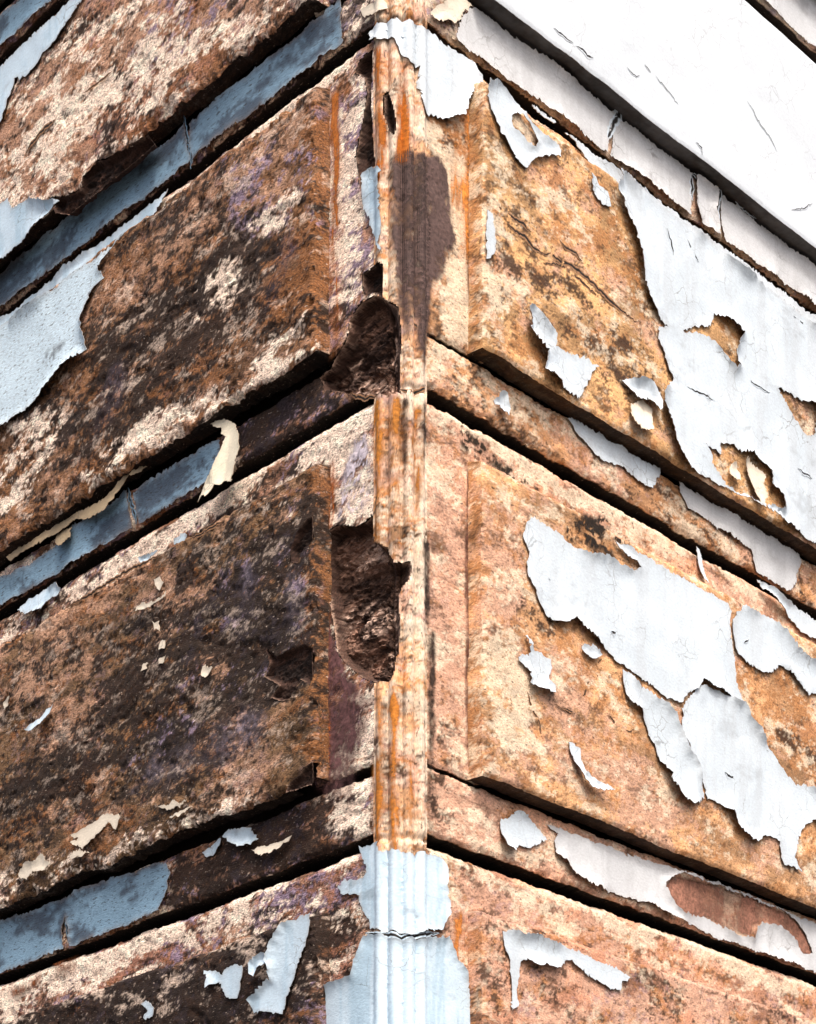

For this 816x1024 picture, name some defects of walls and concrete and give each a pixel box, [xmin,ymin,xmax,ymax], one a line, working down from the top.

peeling [0,0,343,425]
corrosion [377,90,410,181]
water stain [391,150,455,359]
crack [499,206,637,322]
peeling [361,0,816,543]
corrosion [374,397,421,510]
peeling [518,482,816,872]
corrosion [373,691,399,850]
peeling [204,913,310,1014]
peeling [323,841,470,1024]
crack [365,931,439,940]
peeling [500,810,816,973]